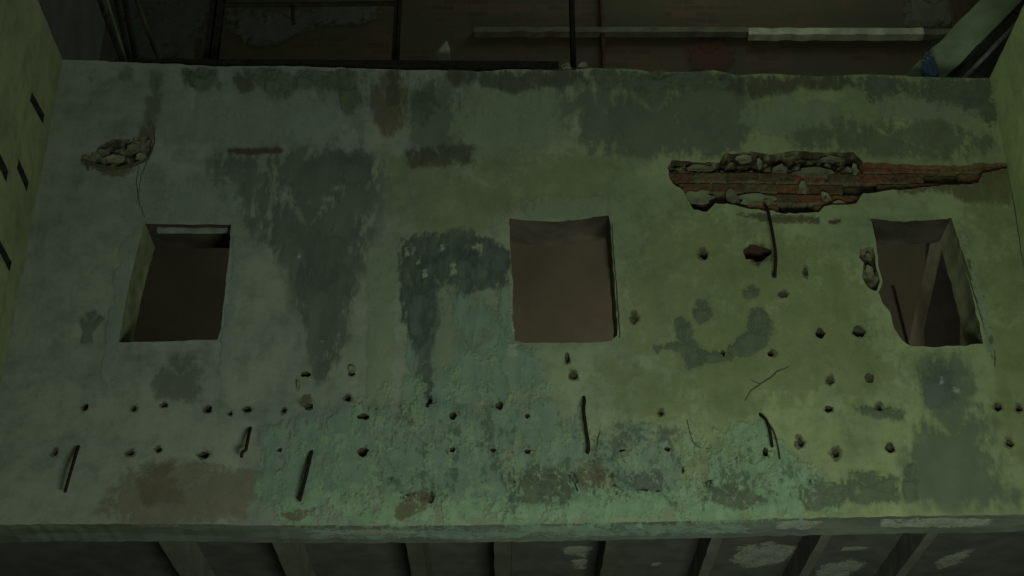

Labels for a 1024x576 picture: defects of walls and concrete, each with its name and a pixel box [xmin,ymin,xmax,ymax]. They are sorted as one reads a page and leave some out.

spalling [80,117,156,203]
leakage [213,144,381,379]
leakage [406,68,998,168]
spalling [668,151,1010,278]
spalling [859,247,880,291]
leakage [256,244,1019,540]